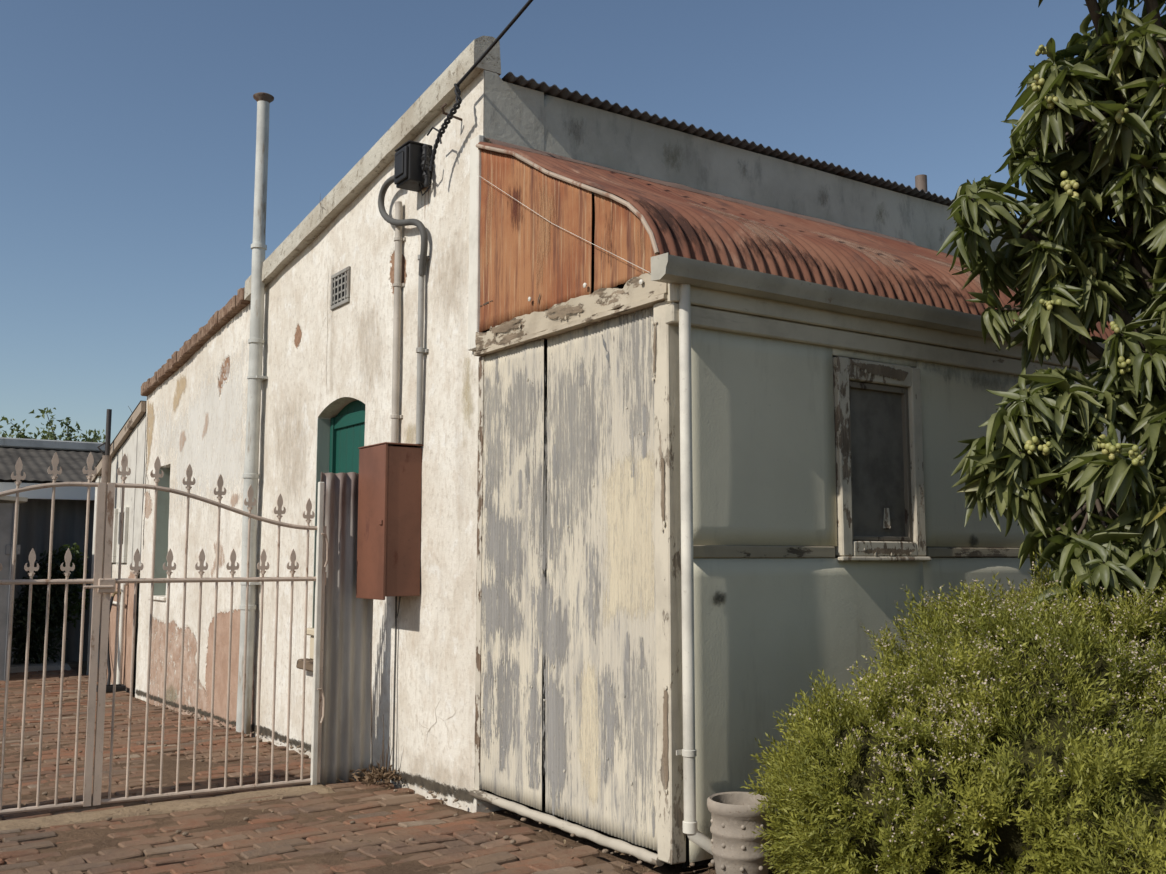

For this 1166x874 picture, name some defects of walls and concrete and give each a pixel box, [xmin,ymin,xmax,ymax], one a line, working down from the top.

rust [507,189,522,229]
rust [515,148,825,270]
flaking render [388,251,407,294]
flaking render [217,355,230,396]
peeling [853,361,908,381]
peeling [480,307,657,821]
peeling [857,548,915,556]
flaking render [149,609,240,729]
peeling [595,631,668,838]